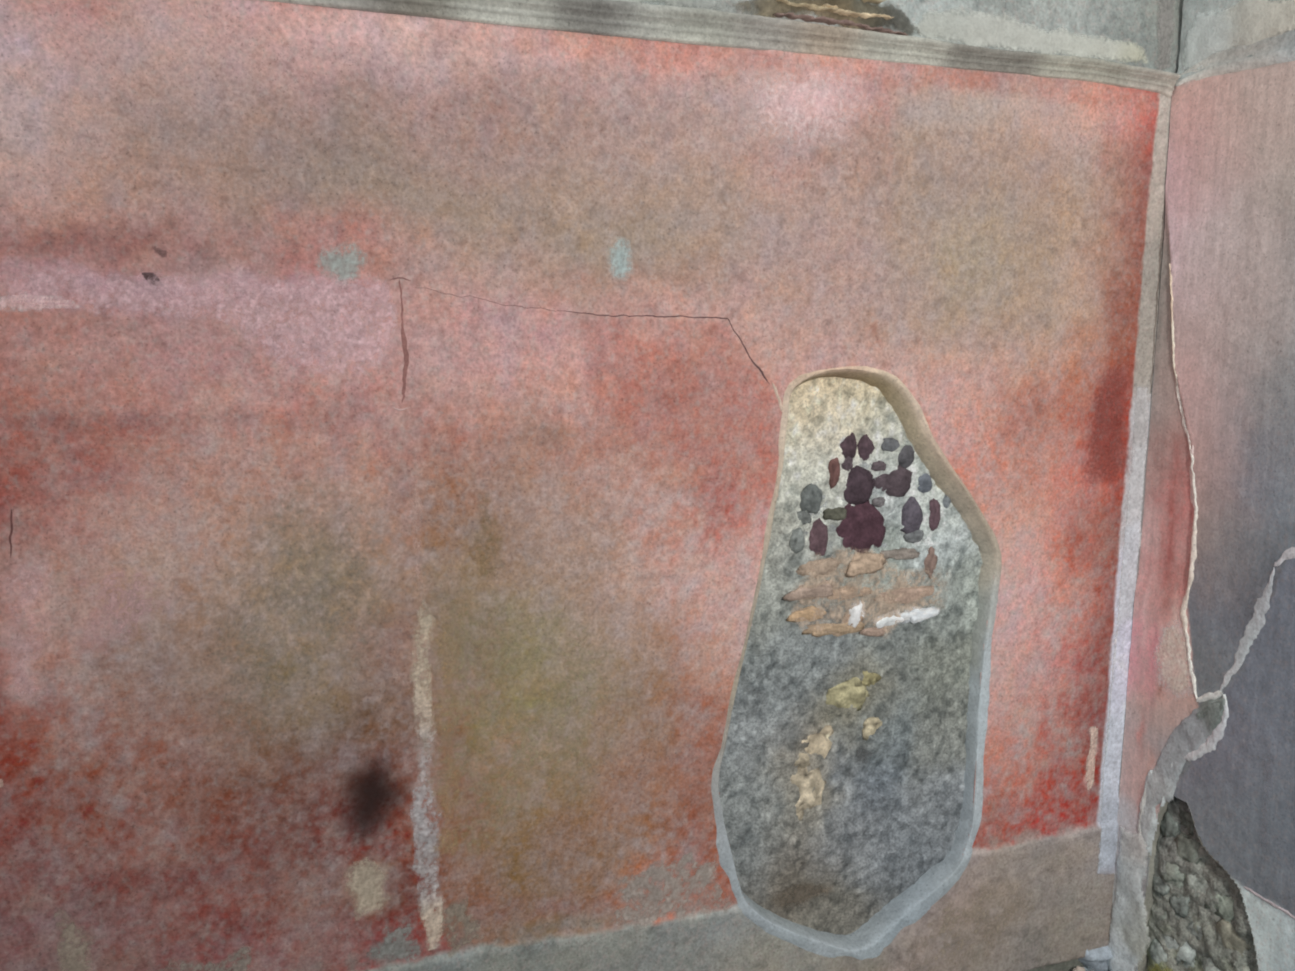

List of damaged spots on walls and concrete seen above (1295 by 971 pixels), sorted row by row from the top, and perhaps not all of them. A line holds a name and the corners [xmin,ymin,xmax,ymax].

crack [390,277,784,413]
crack [1150,139,1295,700]
leakage [353,768,395,830]
peeling [370,610,480,961]
spalling [615,366,1002,960]